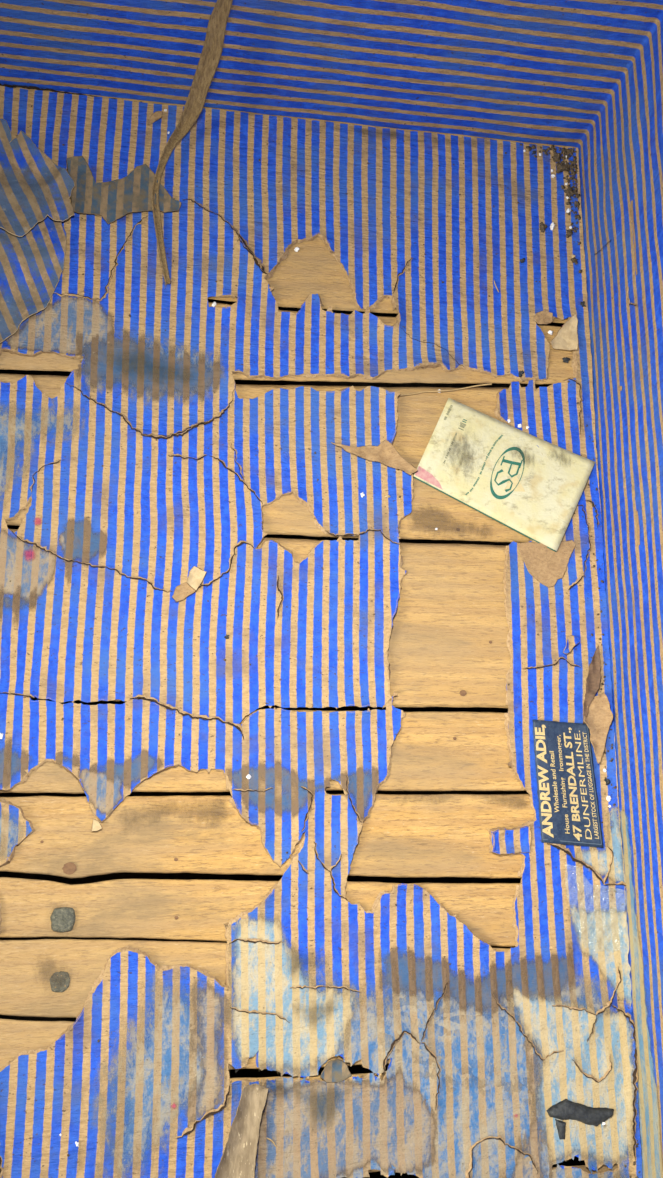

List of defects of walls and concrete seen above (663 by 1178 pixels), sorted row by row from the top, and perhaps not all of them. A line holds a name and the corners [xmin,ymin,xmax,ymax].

peeling [147,111,163,124]
peeling [263,232,401,328]
peeling [231,352,550,445]
crack [30,459,61,493]
crack [12,531,254,592]
peeling [255,490,344,564]
peeling [311,475,414,713]
peeling [563,635,580,654]
crack [0,691,35,699]
crack [130,694,244,739]
peeling [345,546,536,951]
peeling [0,759,305,1072]